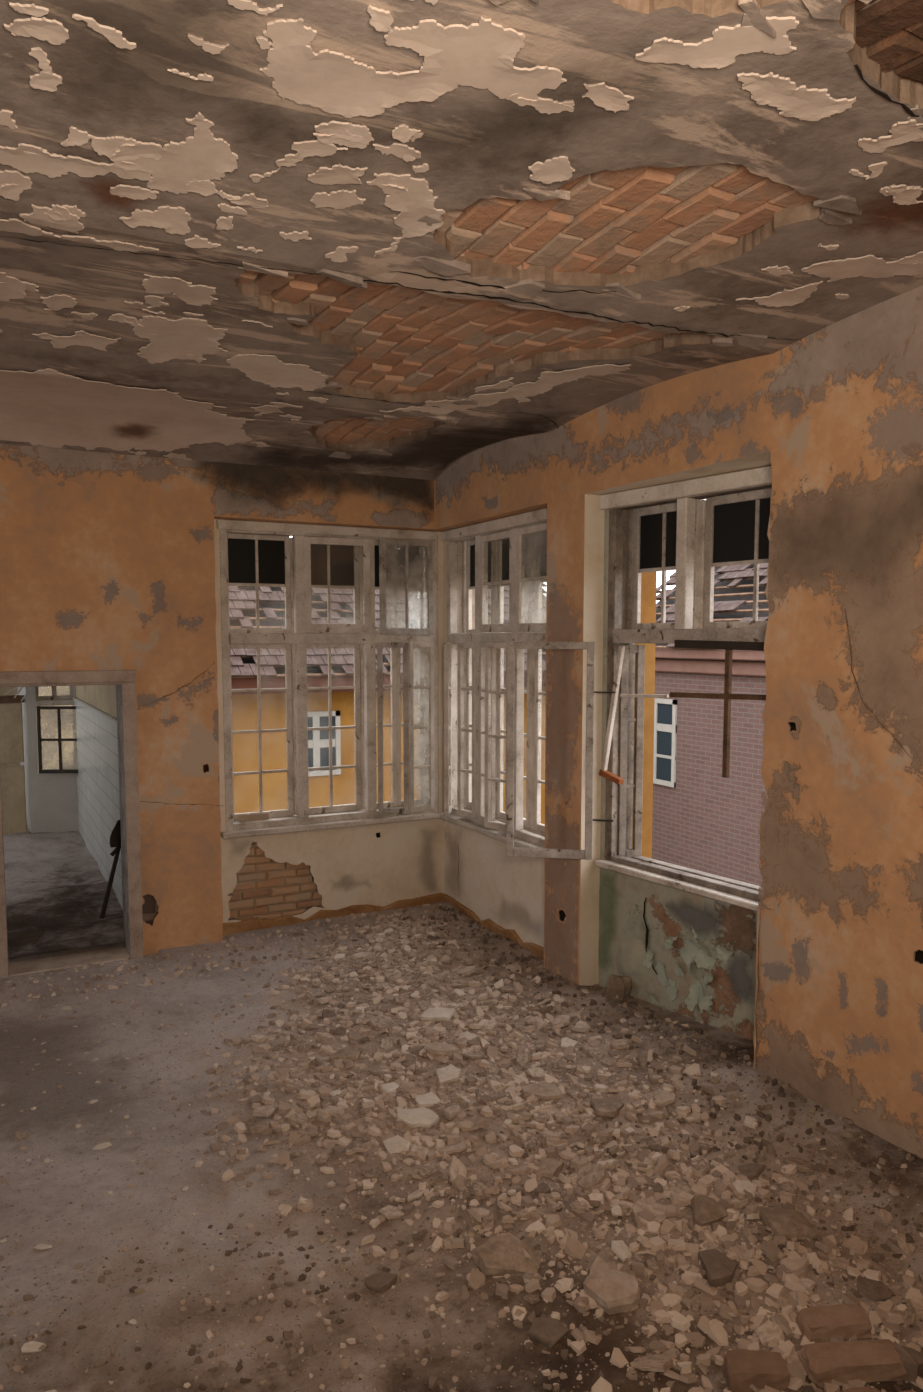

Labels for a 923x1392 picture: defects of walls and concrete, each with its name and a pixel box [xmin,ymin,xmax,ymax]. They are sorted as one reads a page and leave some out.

spalling [0,0,861,300]
peeling [635,0,923,121]
peeling [849,105,923,205]
peeling [0,272,631,542]
peeling [371,243,923,528]
peeling [139,581,203,631]
peeling [768,443,923,778]
spalling [238,813,269,822]
spalling [228,842,323,920]
peeling [642,762,923,1159]